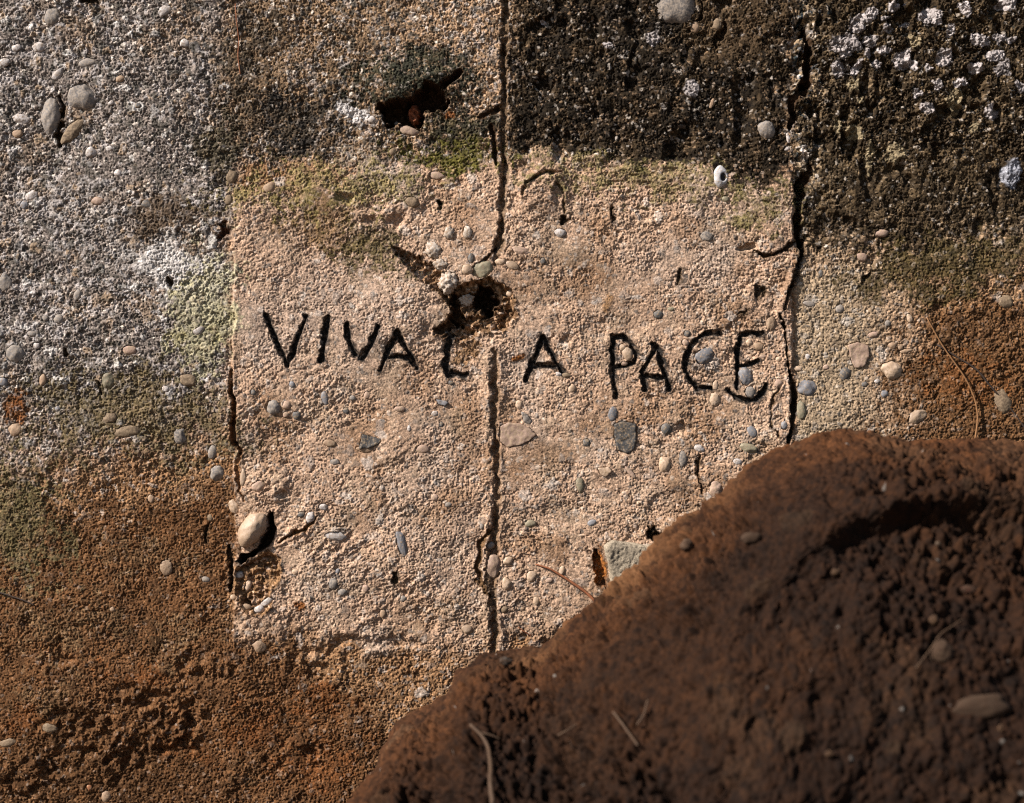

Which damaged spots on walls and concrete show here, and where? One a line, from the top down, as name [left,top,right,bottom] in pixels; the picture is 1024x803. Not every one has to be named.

spalling [375,68,464,134]
crack [477,0,509,267]
leakage [192,0,1024,257]
crack [787,29,813,131]
crack [753,159,812,258]
spalling [396,248,519,366]
crack [228,369,245,502]
spalling [233,512,317,617]
crack [474,348,502,653]
crack [770,308,798,444]